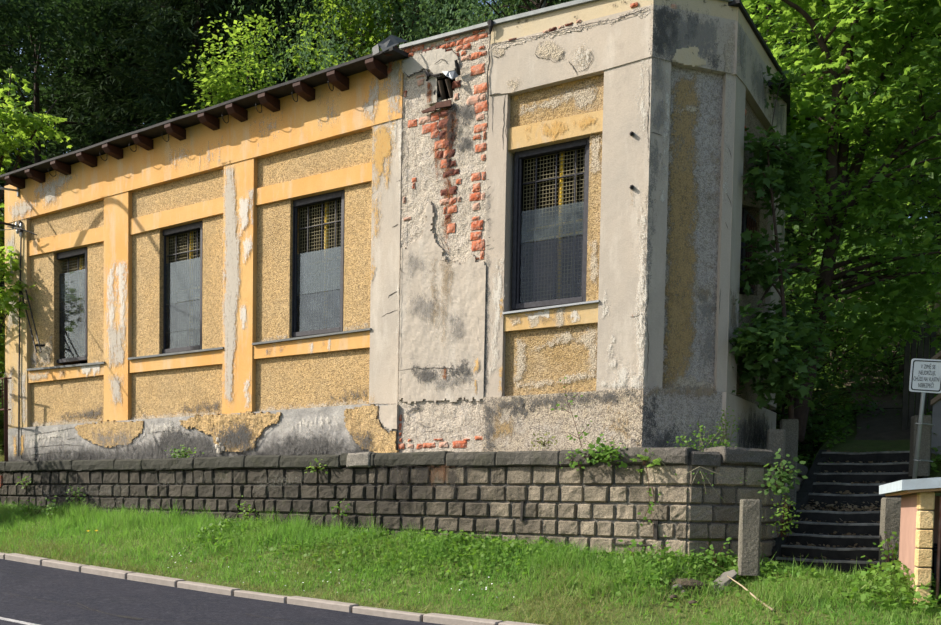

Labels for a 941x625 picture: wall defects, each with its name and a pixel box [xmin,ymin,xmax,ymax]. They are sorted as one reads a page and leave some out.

peeling [672,46,706,67]
peeling [362,2,651,264]
peeling [81,261,128,404]
peeling [169,139,254,408]
damp [408,5,724,452]
peeling [587,240,599,283]
peeling [75,420,144,449]
peeling [344,398,483,453]